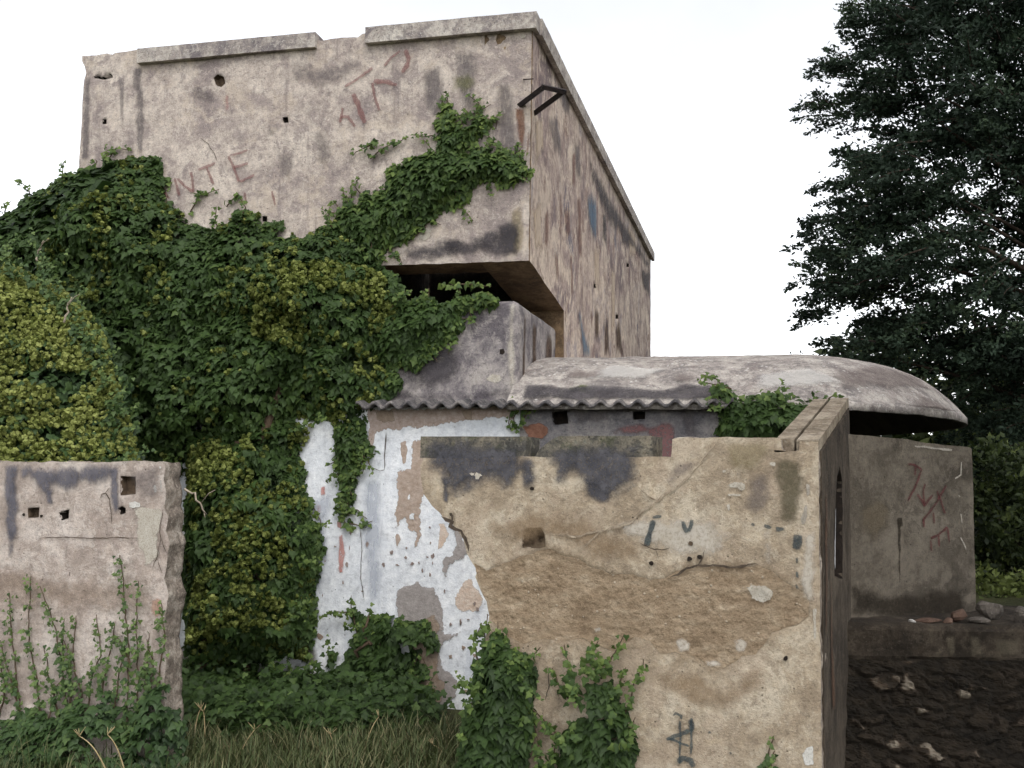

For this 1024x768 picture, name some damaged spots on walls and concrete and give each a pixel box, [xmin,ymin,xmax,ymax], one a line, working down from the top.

water stain [409,223,517,258]
water stain [429,442,534,502]
water stain [553,447,635,502]
water stain [5,466,118,554]
crack [441,513,469,551]
spalling [367,406,817,704]
crack [640,543,757,578]